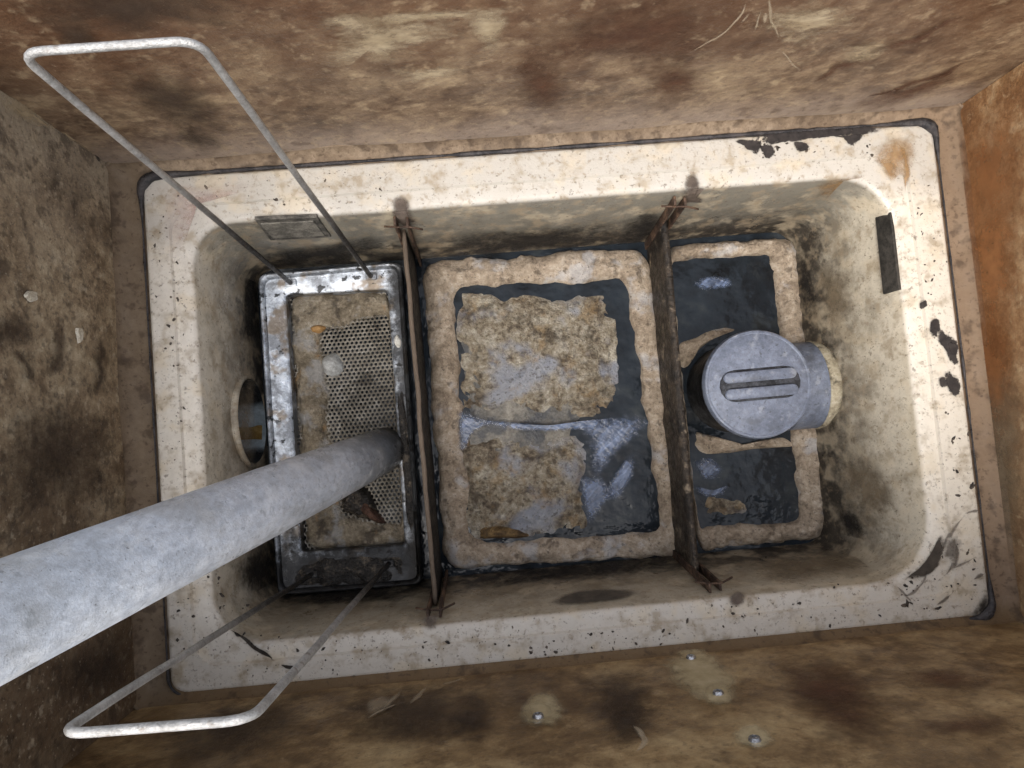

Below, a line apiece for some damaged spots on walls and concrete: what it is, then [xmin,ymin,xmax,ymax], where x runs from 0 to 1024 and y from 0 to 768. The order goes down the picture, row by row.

damp [64,0,201,44]
rust [393,198,414,226]
rust [968,129,1016,441]
damp [51,327,65,374]
damp [838,509,862,536]
damp [557,589,631,603]
damp [672,649,733,702]
damp [524,695,560,723]